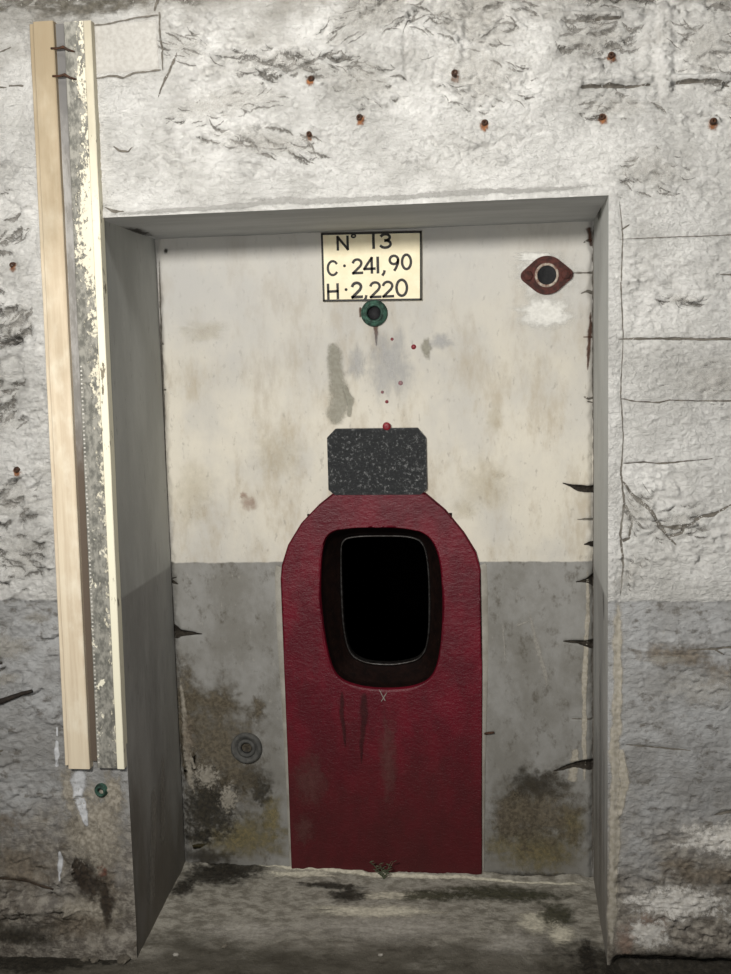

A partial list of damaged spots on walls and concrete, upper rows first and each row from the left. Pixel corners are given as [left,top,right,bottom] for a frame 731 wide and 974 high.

leakage [328,344,353,424]
crack [619,209,731,595]
leakage [176,668,270,864]